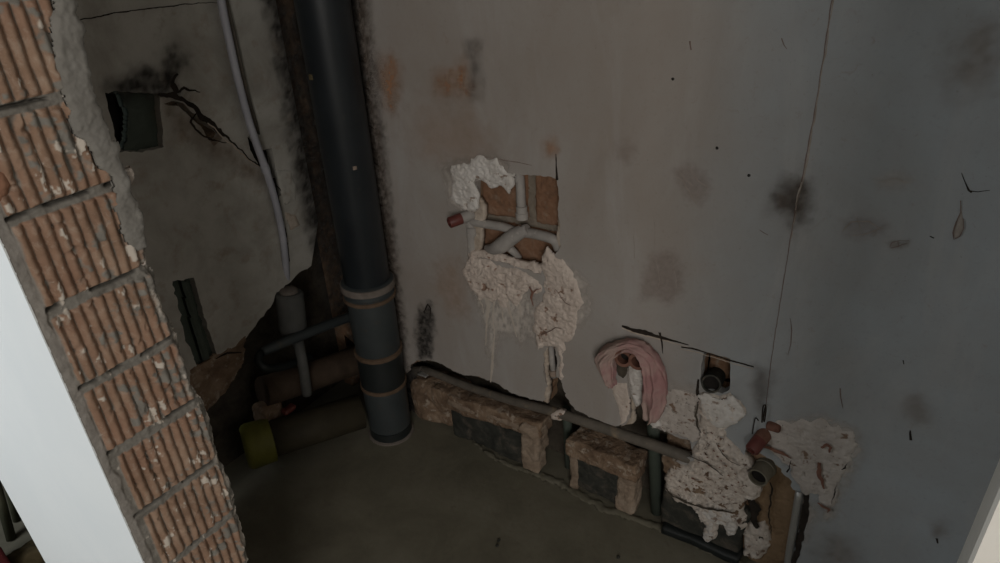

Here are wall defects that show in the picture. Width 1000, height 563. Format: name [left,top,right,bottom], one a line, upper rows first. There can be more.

flaking render [0,0,248,563]
crack [158,73,281,191]
damp [418,304,434,359]
crack [763,0,834,421]
spalling [650,353,860,563]